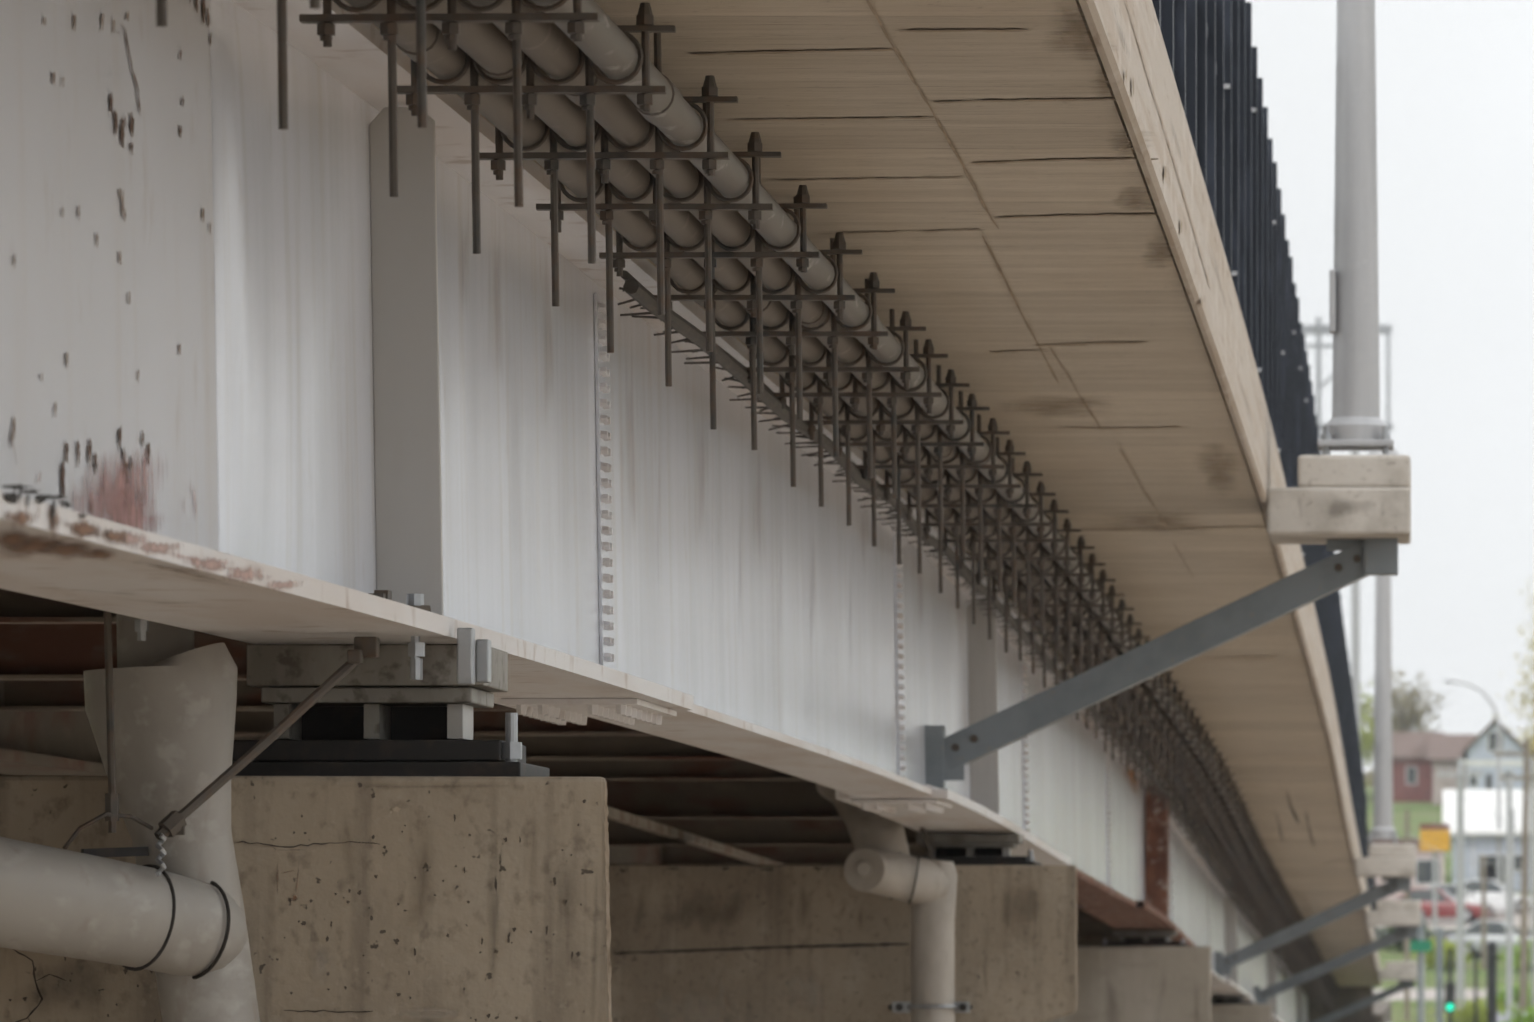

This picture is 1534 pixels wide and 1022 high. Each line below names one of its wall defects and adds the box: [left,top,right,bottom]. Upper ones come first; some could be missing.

corrosion [0,459,293,590]
crack [13,949,66,1022]